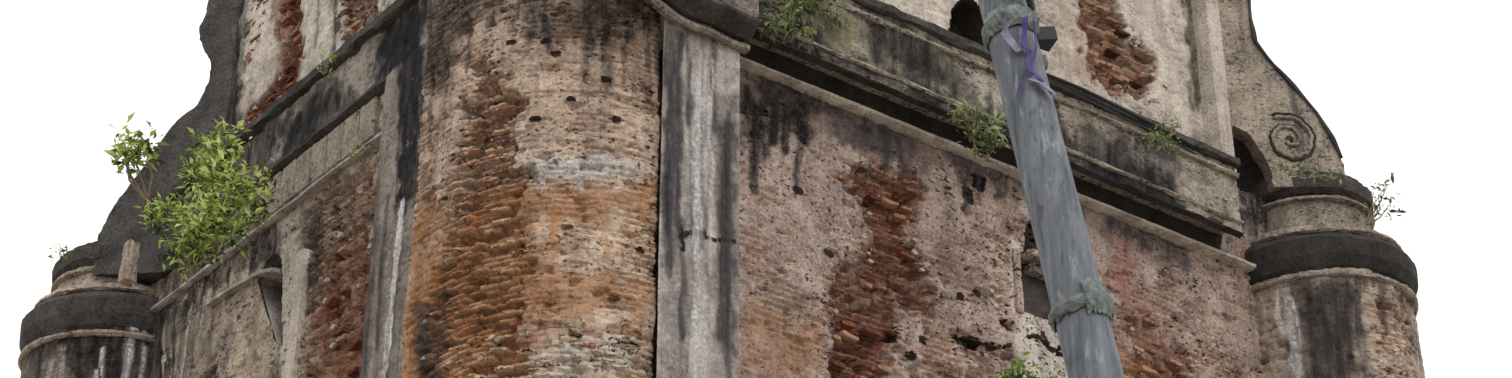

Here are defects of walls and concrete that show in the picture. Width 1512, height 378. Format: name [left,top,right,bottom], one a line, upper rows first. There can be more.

spalling [242,0,303,127]
leakage [275,84,340,164]
spalling [469,39,541,134]
spalling [540,37,561,57]
spalling [1071,0,1167,115]
leakage [29,215,281,378]
spalling [322,222,372,378]
spalling [414,148,646,378]
leakage [645,32,912,378]
spalling [810,164,930,378]
spalling [961,173,987,206]
flaking render [951,225,1014,351]